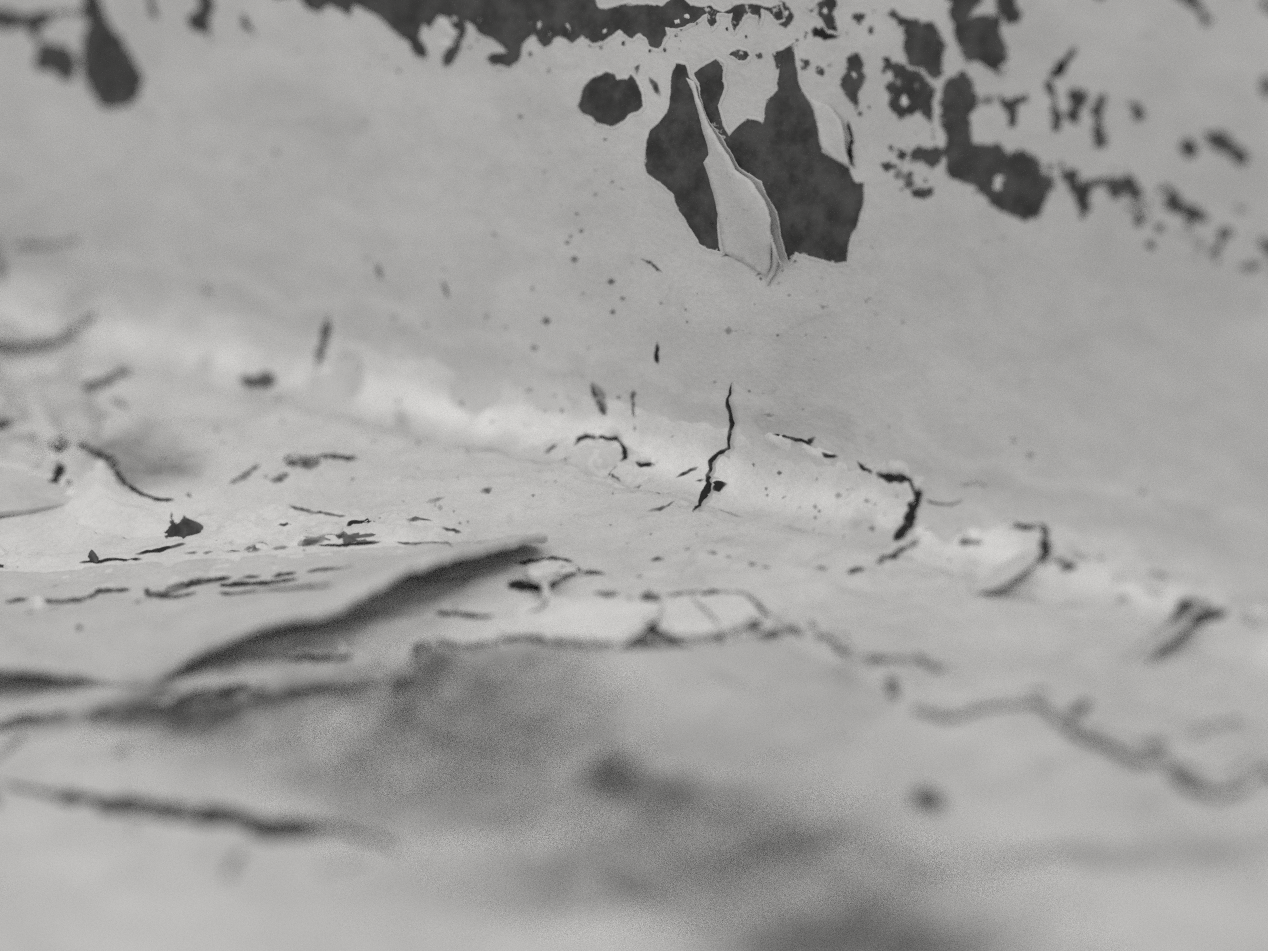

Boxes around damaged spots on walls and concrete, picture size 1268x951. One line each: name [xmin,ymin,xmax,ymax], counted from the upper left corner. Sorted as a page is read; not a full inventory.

peeling [0,0,149,113]
peeling [186,0,215,42]
peeling [273,0,1234,286]
peeling [1179,130,1249,166]
peeling [1260,76,1268,99]
crack [652,344,660,363]
crack [547,382,744,513]
crack [775,434,1069,574]